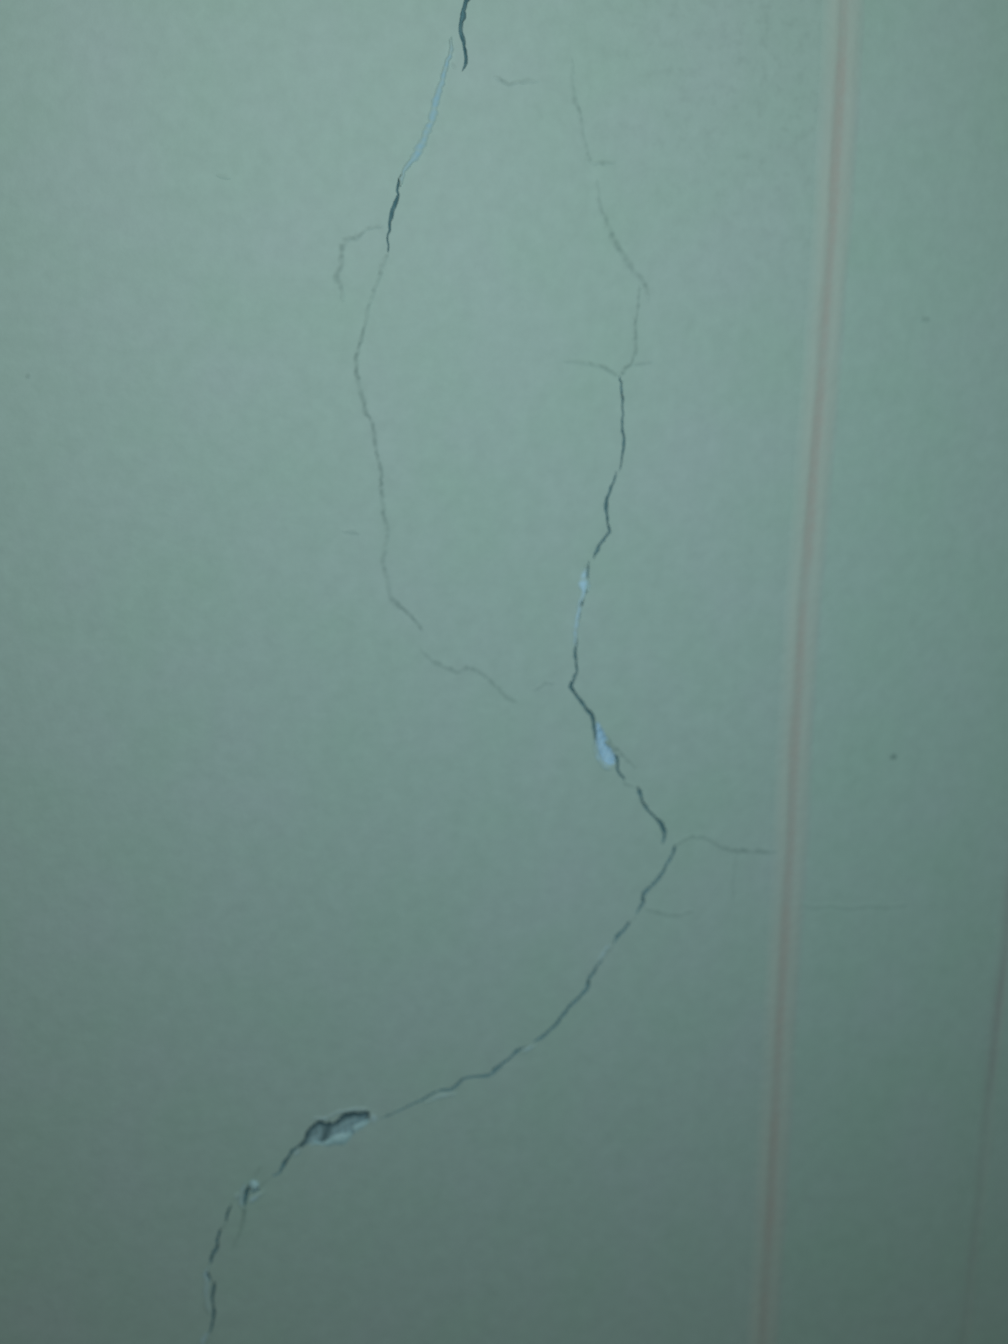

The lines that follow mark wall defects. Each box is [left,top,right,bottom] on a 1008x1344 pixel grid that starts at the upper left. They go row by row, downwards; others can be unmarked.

crack [332,0,777,1119]
crack [198,1143,302,1344]